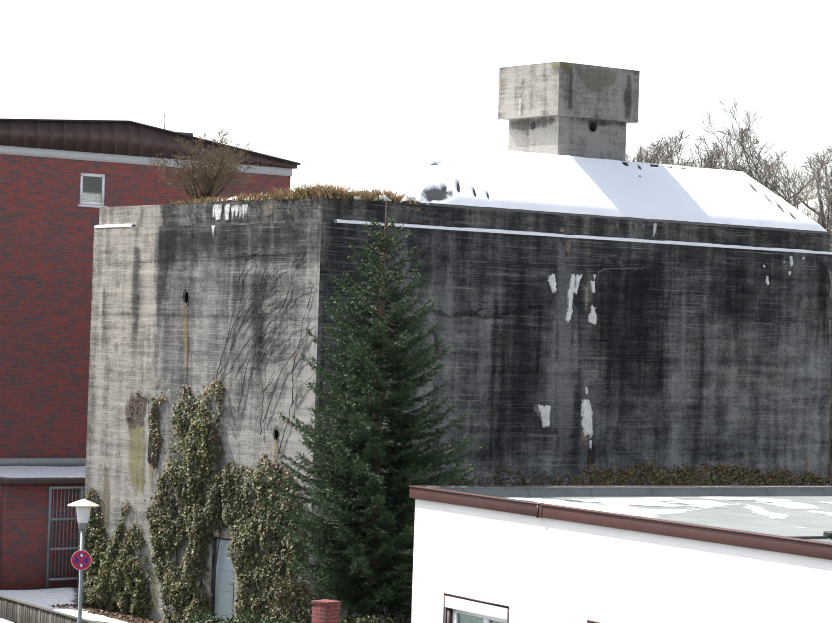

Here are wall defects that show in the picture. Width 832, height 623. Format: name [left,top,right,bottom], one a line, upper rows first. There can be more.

leakage [212,204,249,233]
leakage [132,248,140,339]
leakage [157,230,176,311]
leakage [550,246,582,433]